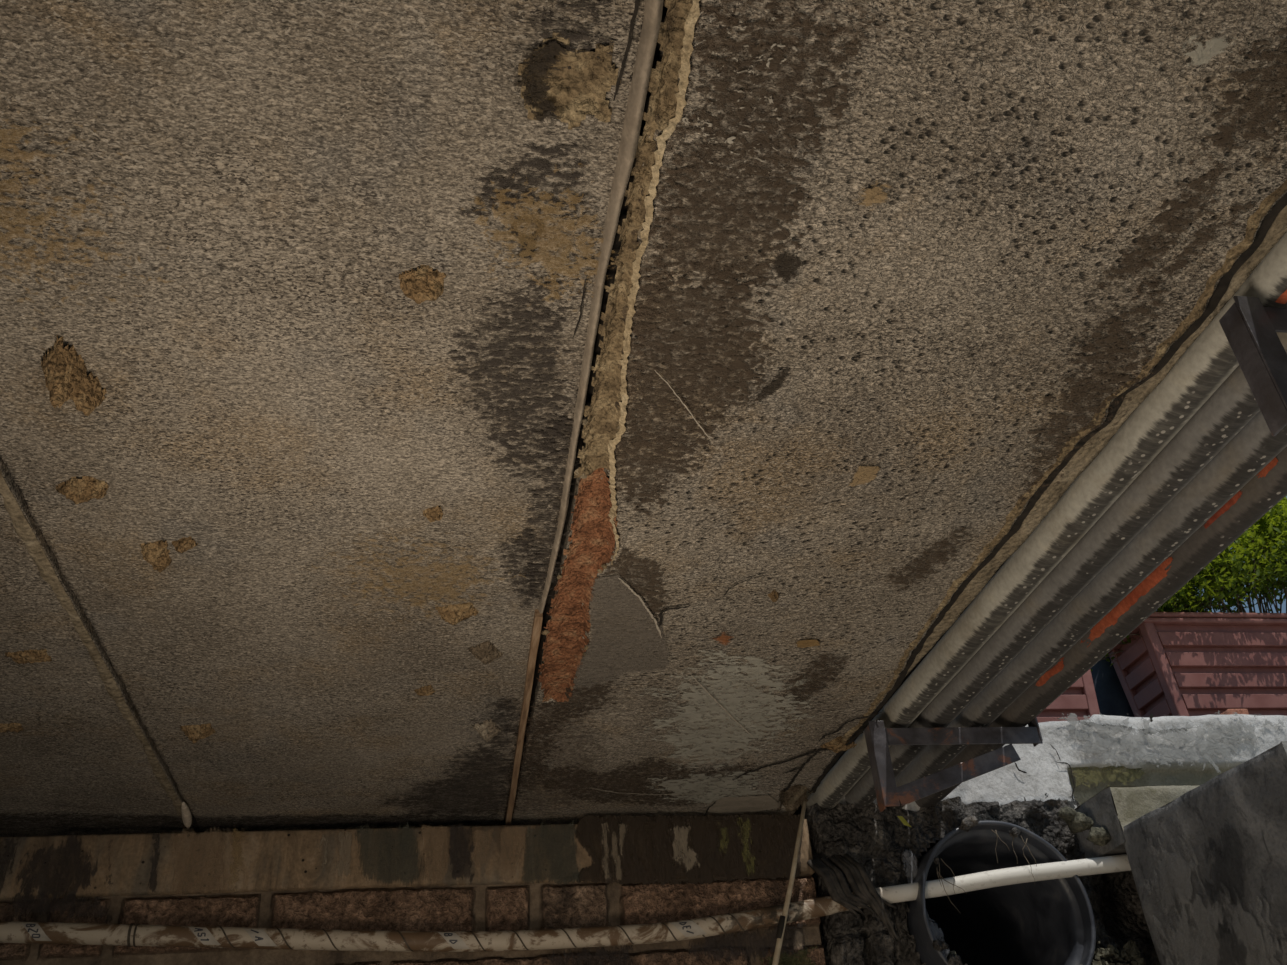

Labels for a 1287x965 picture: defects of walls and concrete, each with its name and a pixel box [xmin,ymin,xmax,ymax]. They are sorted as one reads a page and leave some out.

damp [444,269,589,608]
damp [458,131,600,226]
peeling [514,33,621,130]
damp [514,0,626,71]
crack [507,0,668,801]
spalling [537,0,700,702]
damp [604,549,670,620]
damp [604,0,899,517]
damp [1004,19,1287,508]
damp [0,646,849,923]